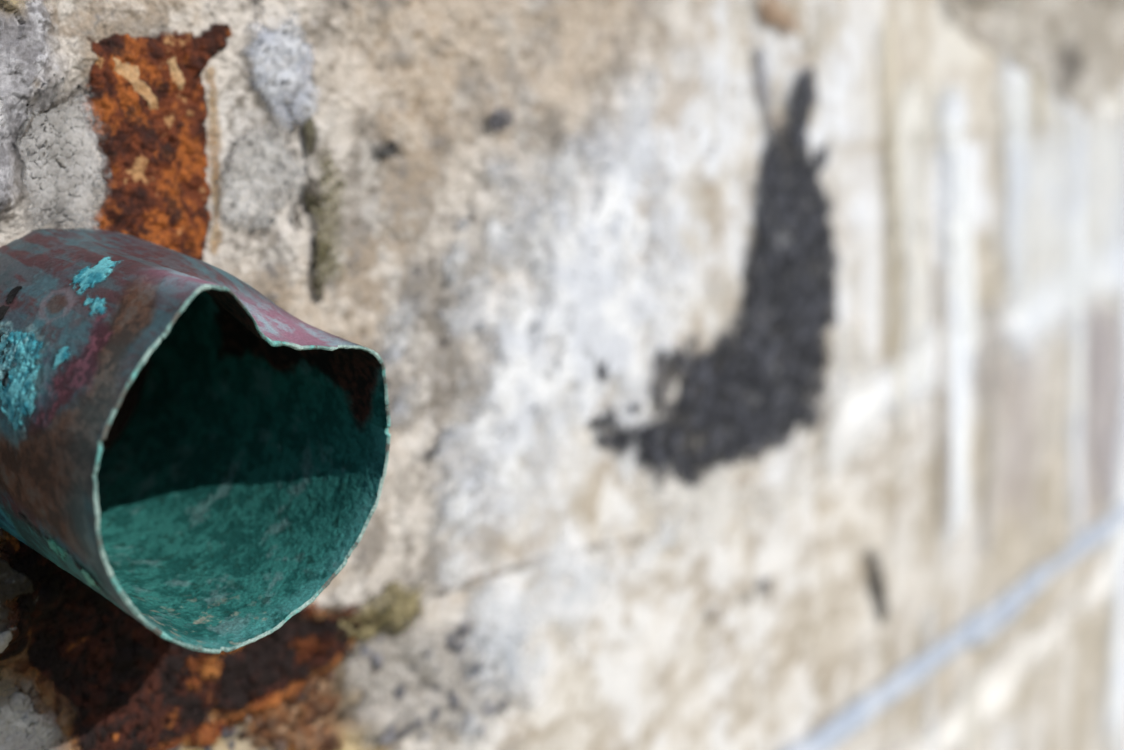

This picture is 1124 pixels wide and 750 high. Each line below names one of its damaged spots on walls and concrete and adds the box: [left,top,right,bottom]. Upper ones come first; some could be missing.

rust [208,68,220,208]
rust [0,534,376,750]